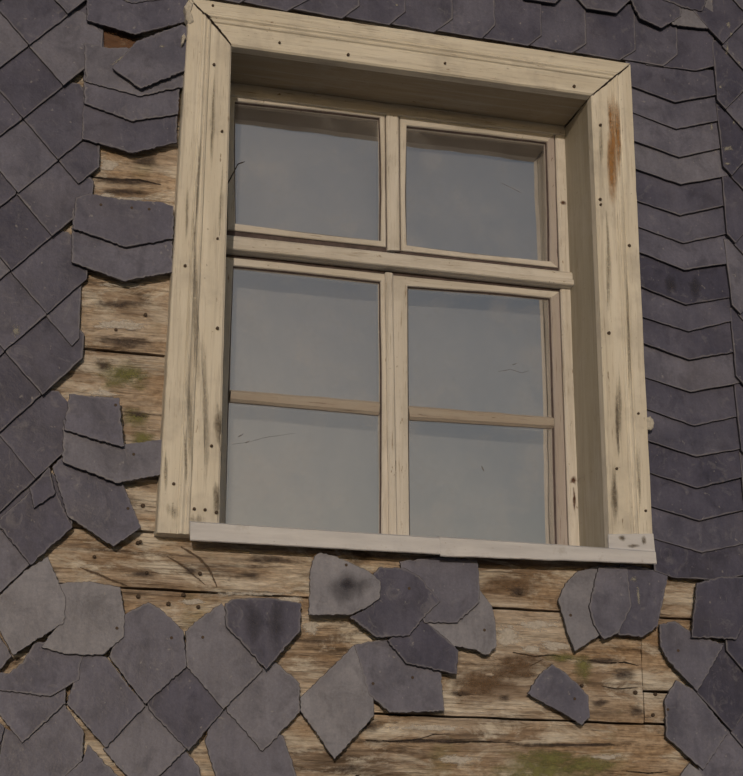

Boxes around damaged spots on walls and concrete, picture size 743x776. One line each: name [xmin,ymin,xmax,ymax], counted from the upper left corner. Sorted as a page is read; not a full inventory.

rust [609,112,620,185]
peeling [100,160,118,170]
peeling [301,621,319,634]
peeling [497,621,571,652]
peeling [441,754,473,766]